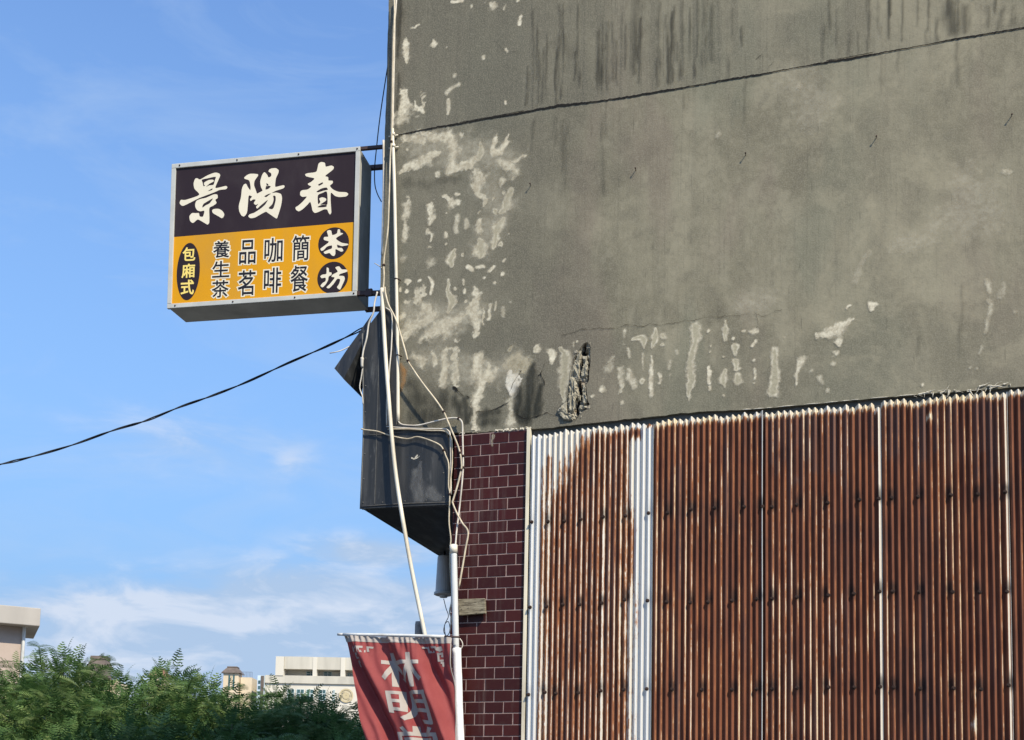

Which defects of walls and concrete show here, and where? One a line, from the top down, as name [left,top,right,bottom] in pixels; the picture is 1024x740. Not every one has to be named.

crack [398,27,1024,135]
flaking render [505,370,522,399]
flaking render [557,341,591,421]
flaking render [900,382,1011,398]